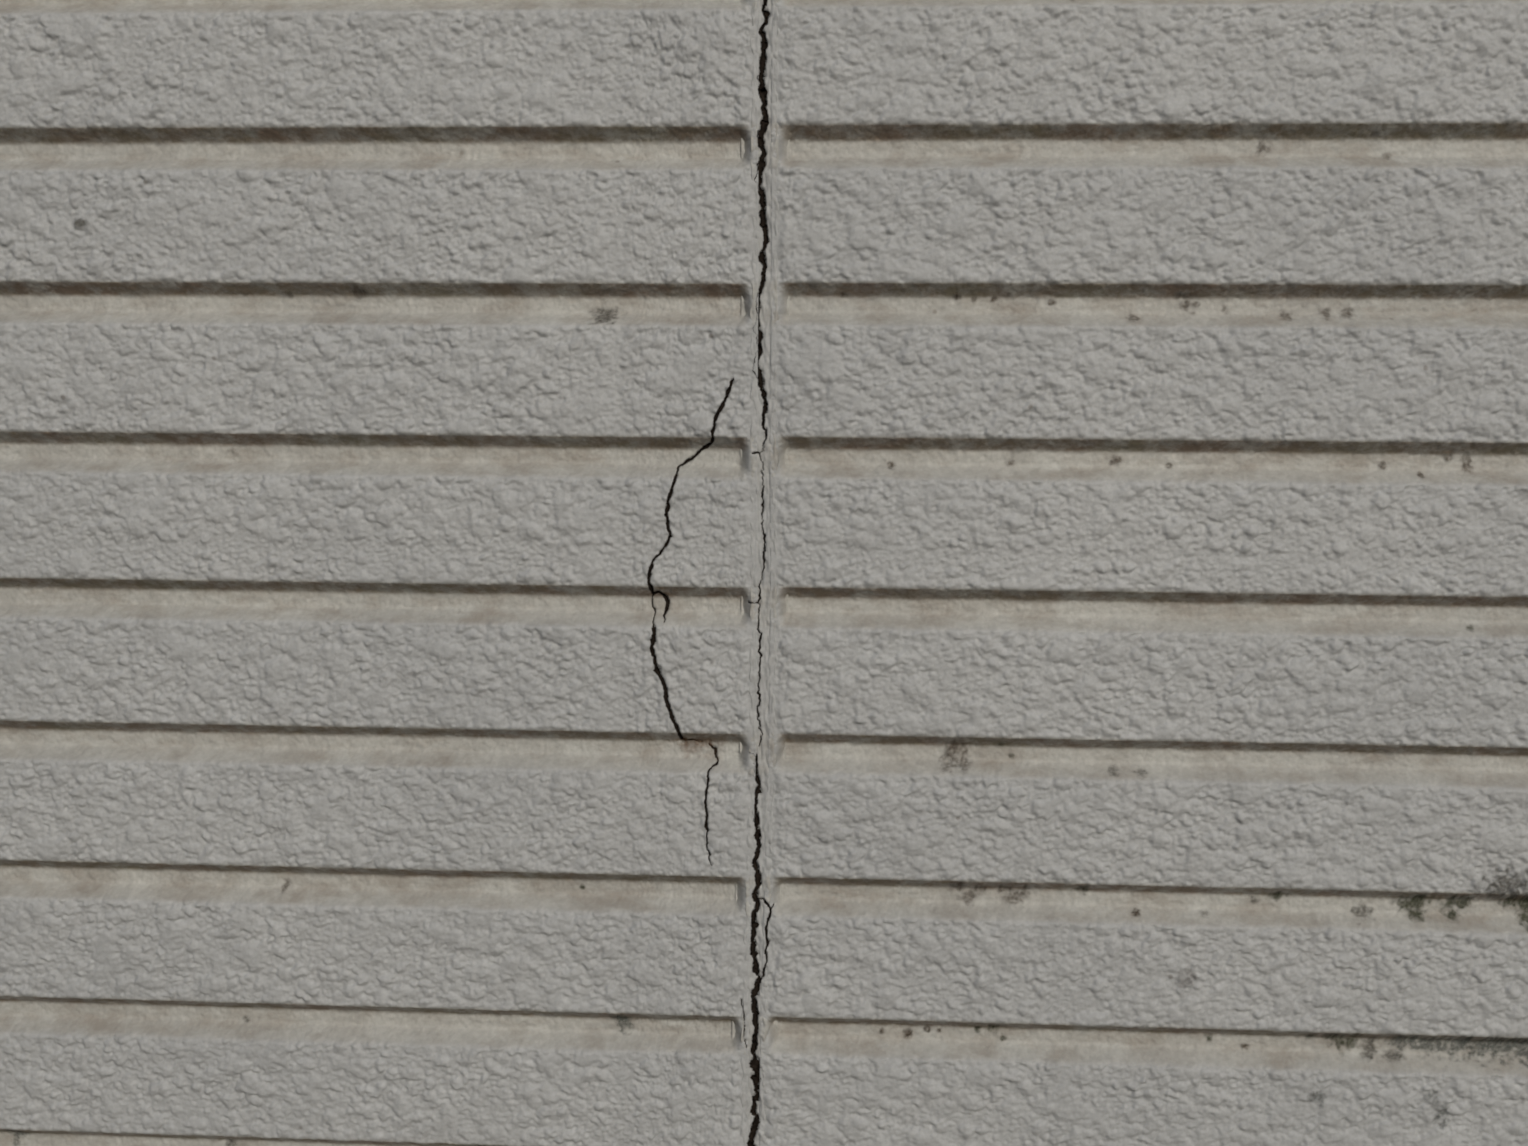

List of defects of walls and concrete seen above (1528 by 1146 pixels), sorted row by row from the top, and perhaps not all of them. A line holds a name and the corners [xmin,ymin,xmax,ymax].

crack [647,0,774,1146]